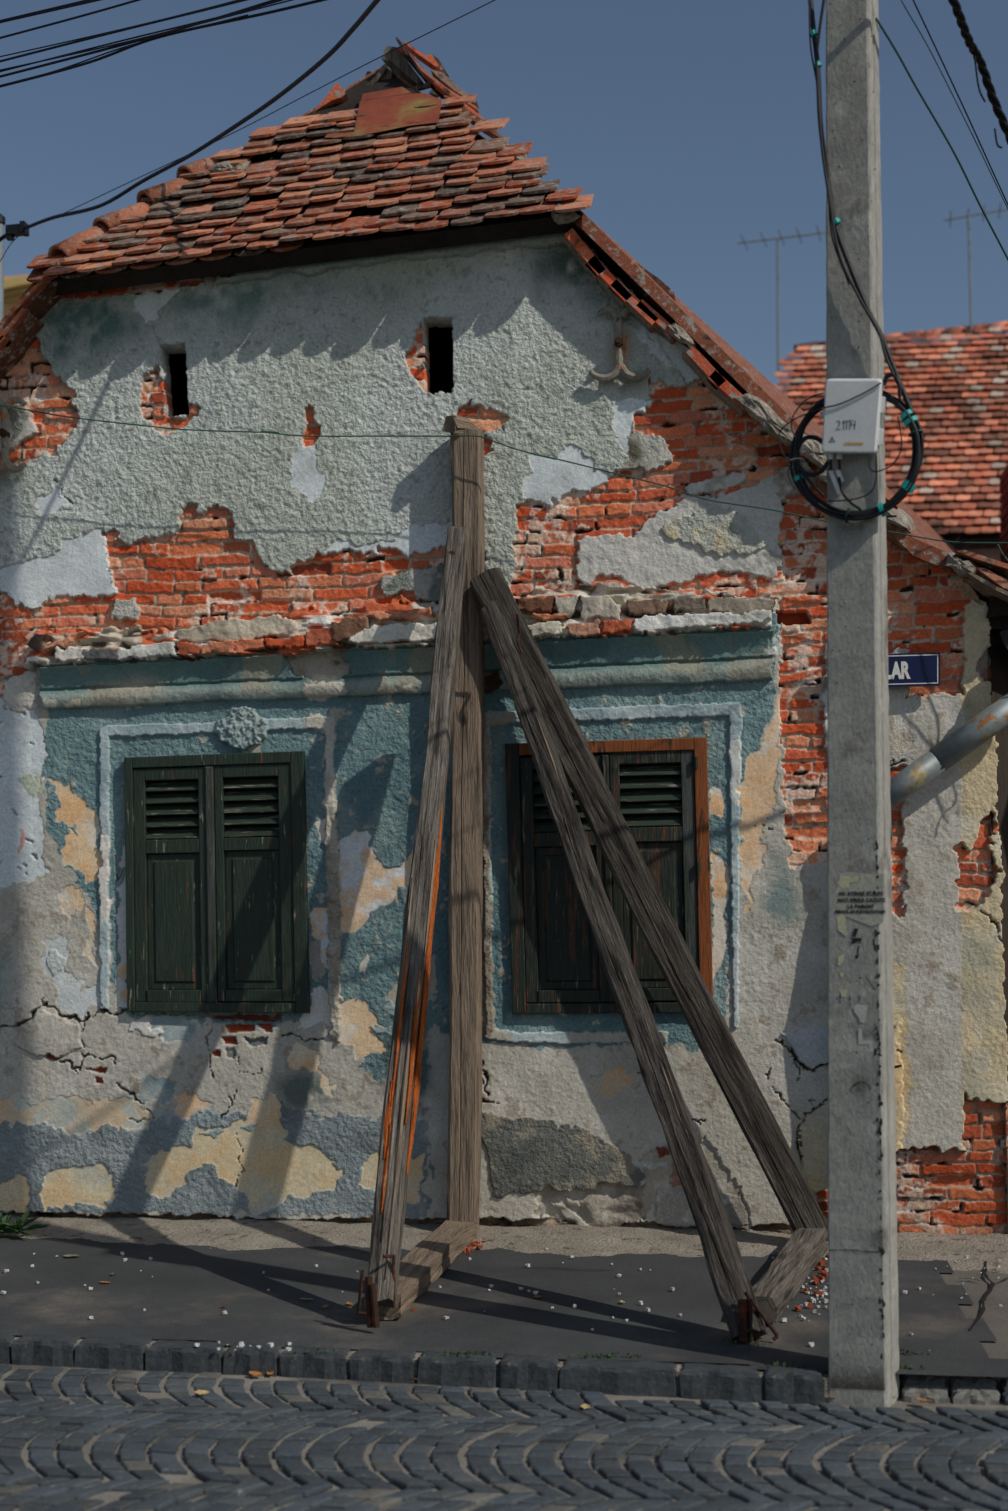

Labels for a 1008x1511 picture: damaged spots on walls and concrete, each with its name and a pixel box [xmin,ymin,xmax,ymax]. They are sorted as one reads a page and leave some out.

flaking render [0,339,79,465]
flaking render [511,326,828,978]
flaking render [886,540,992,779]
flaking render [0,505,452,1097]
flaking render [482,671,518,1041]
flaking render [838,801,908,918]
flaking render [953,812,1001,911]
crack [2,1003,138,1100]
peeling [0,1067,373,1223]
flaking render [479,1110,696,1229]
crack [767,1040,871,1149]
flaking render [873,929,1008,1360]